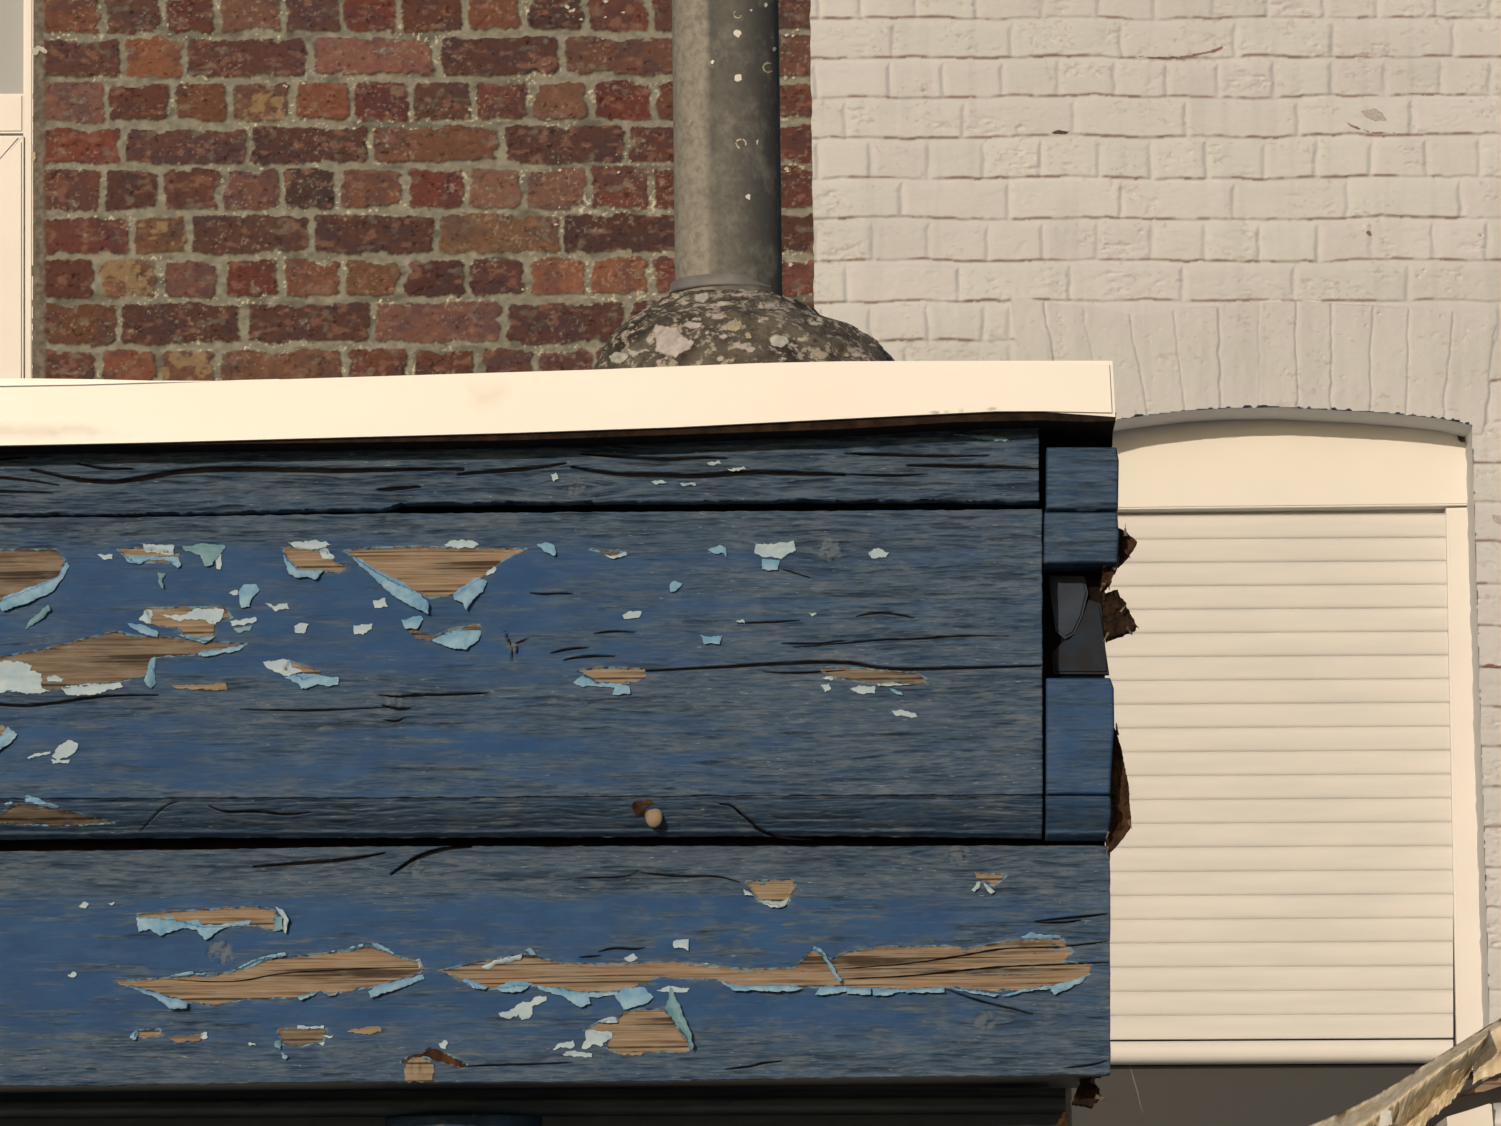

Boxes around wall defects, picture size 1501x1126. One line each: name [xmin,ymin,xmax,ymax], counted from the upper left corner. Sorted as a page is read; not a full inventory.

peeling [97,543,226,588]
spalling [754,540,796,570]
peeling [0,548,69,629]
peeling [283,539,556,650]
peeling [0,584,309,696]
spalling [263,659,339,689]
peeling [819,666,933,718]
spalling [28,740,78,764]
peeling [743,879,795,908]
peeling [136,906,289,940]
peeling [118,932,1091,1060]
peeling [402,1040,466,1083]